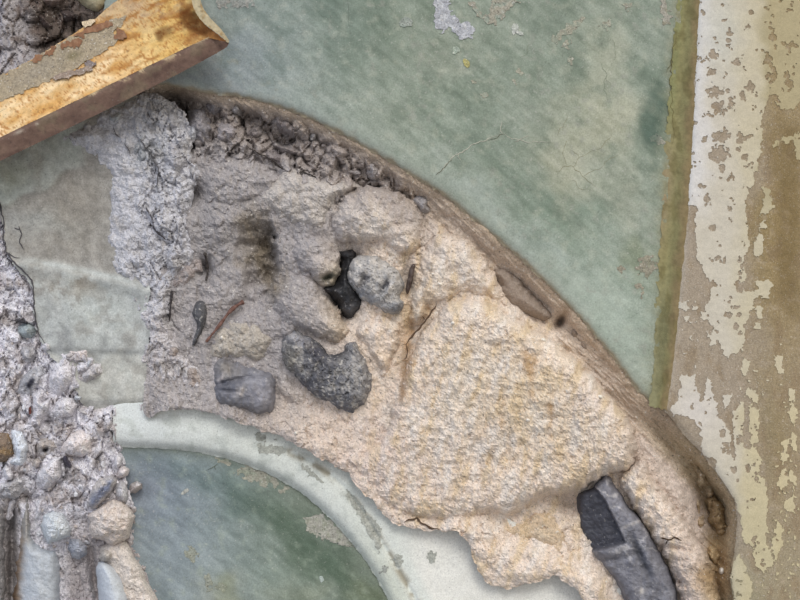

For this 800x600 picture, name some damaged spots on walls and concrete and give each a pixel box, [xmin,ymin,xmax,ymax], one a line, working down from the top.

rust [32,20,127,63]
peeling [433,0,521,68]
peeling [678,0,800,358]
crack [401,303,437,359]
spalling [63,84,800,600]